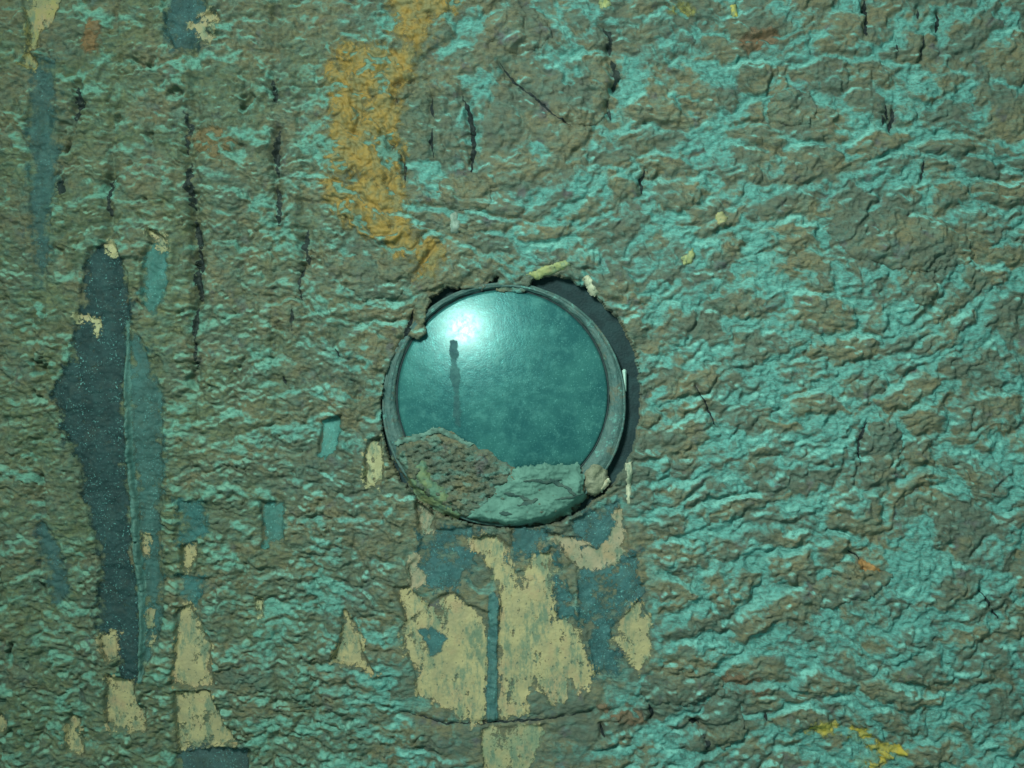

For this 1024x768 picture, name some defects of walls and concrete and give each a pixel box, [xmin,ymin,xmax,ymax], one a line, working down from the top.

crack [271,80,279,103]
crack [272,131,283,226]
crack [462,96,477,172]
crack [499,62,573,127]
crack [603,29,621,120]
crack [182,111,205,367]
crack [289,230,311,331]
spalling [48,227,171,737]
spalling [33,522,72,604]
peeling [167,497,249,768]
peeling [329,609,382,679]
peeling [397,462,654,768]